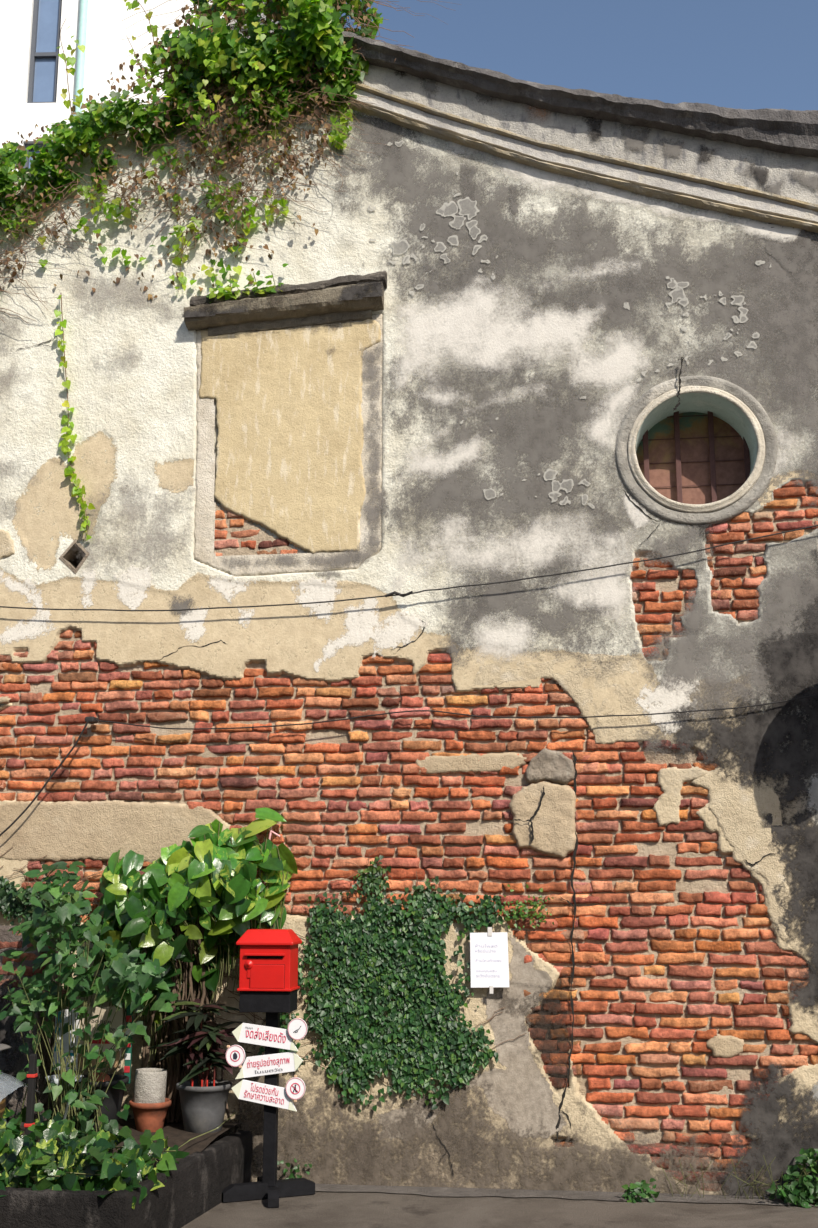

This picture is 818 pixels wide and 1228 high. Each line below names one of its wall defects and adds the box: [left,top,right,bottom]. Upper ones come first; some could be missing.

leakage [164,110,818,669]
crack [673,357,684,410]
spalling [0,431,818,1191]
leakage [210,1063,818,1197]
crack [514,786,545,844]
crack [556,750,578,1142]
leakage [634,549,818,1013]